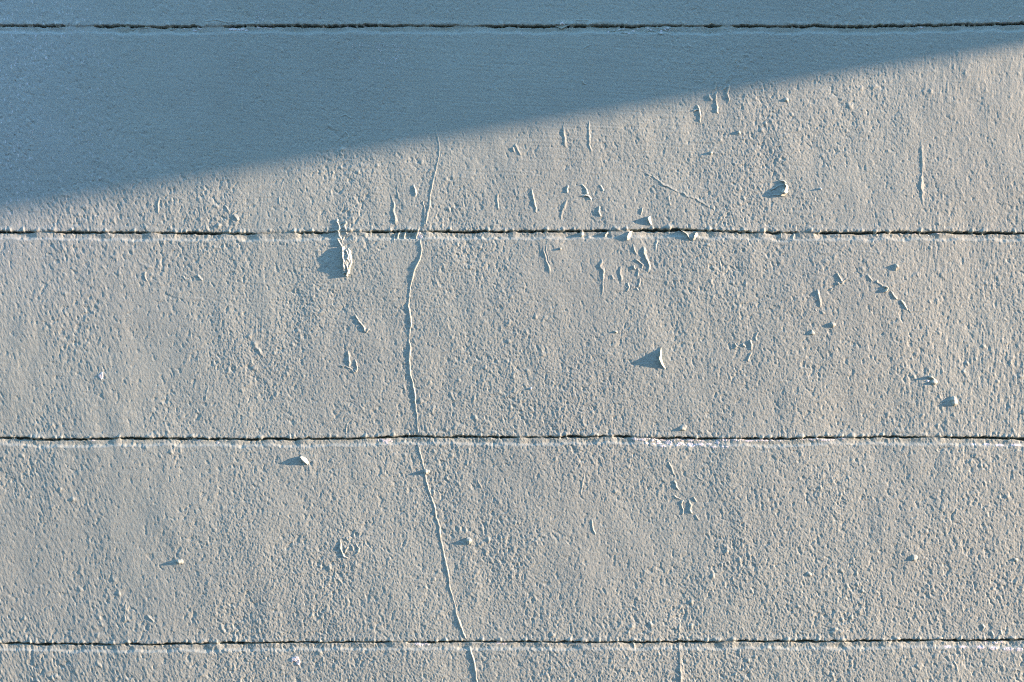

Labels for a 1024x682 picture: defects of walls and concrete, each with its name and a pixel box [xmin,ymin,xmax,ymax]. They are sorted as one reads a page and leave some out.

spalling [768,180,788,197]
peeling [335,219,352,277]
crack [407,61,481,682]